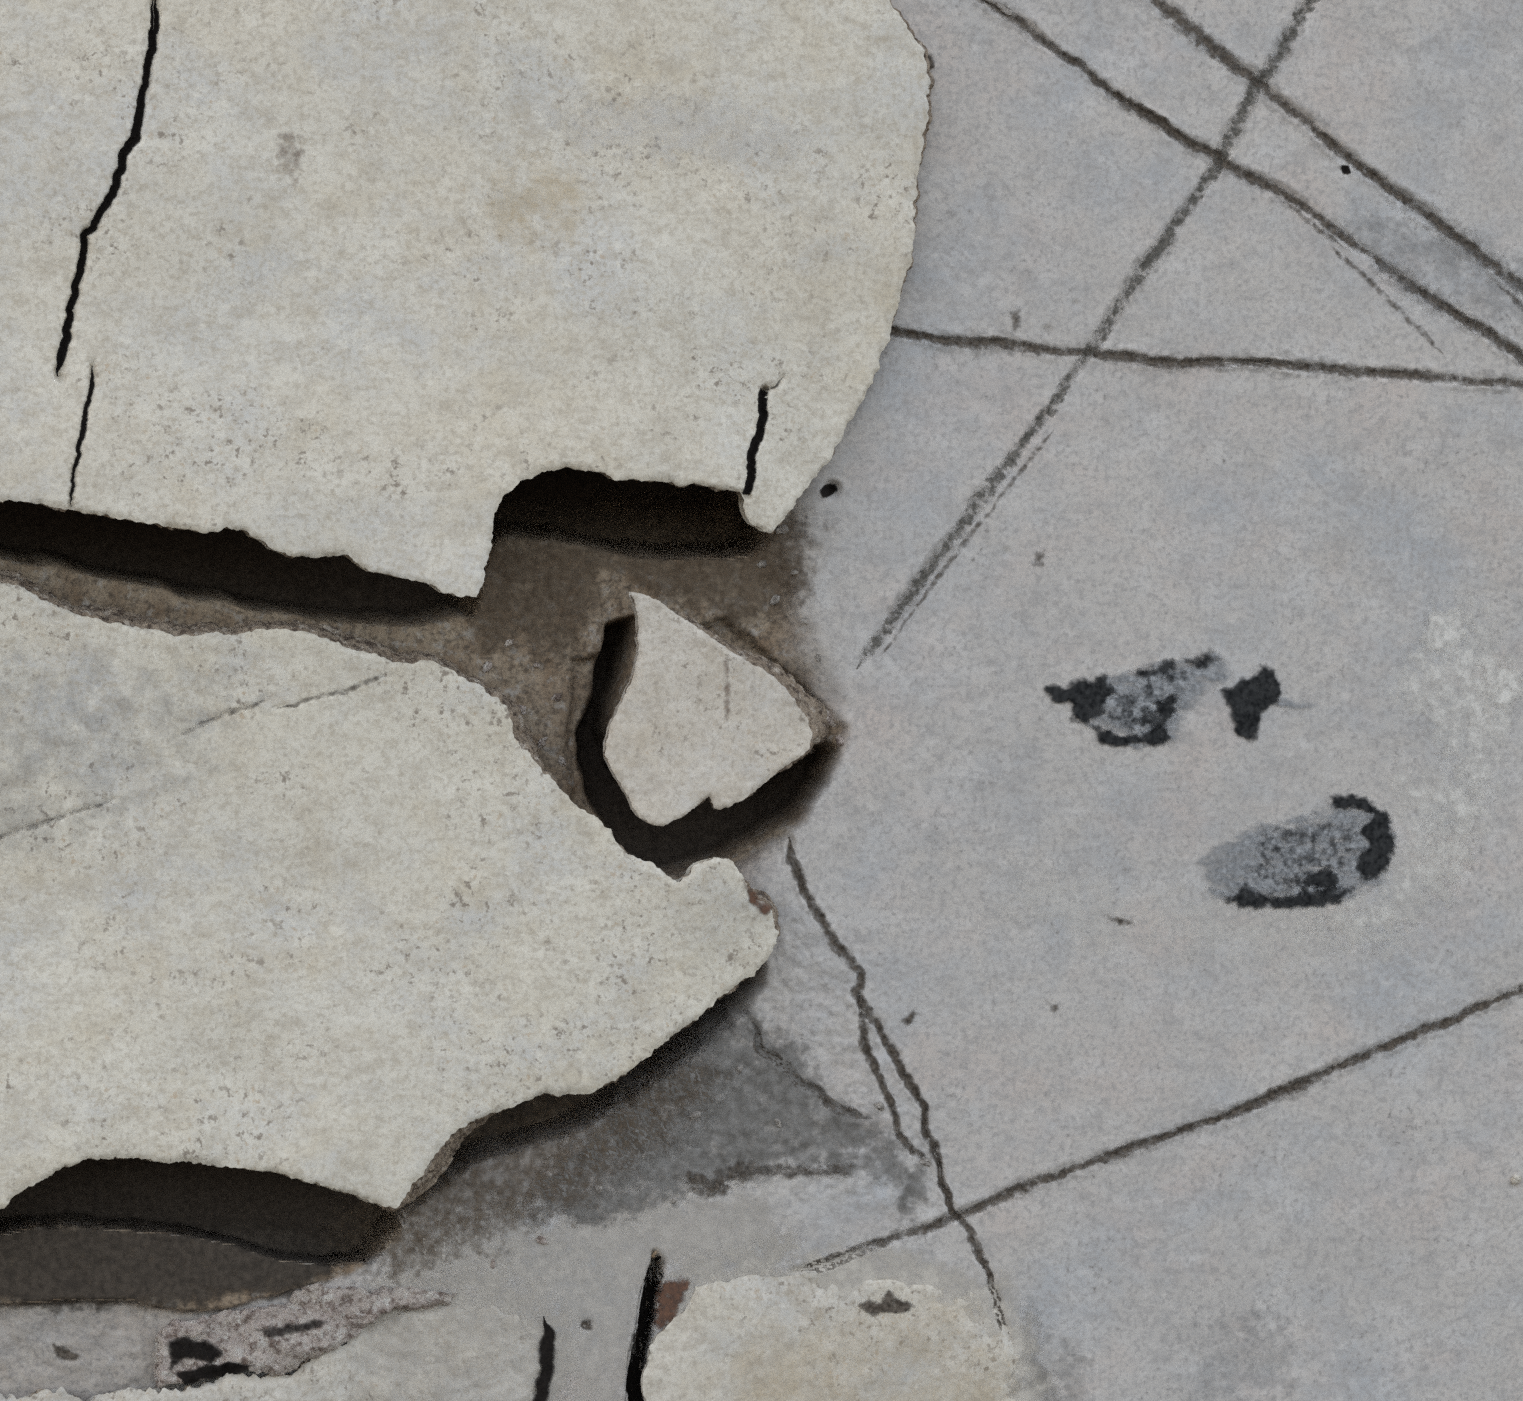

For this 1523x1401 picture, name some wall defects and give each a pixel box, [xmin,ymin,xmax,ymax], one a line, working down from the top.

spalling [889,0,935,342]
crack [56,0,159,504]
crack [743,377,783,495]
spalling [821,484,837,497]
spalling [0,570,561,789]
leakage [1044,653,1310,749]
leakage [1204,605,1523,935]
crack [751,837,1009,1334]
spalling [381,1109,504,1212]
spalling [53,1344,78,1360]
spalling [139,1282,457,1392]
spalling [859,1290,911,1315]